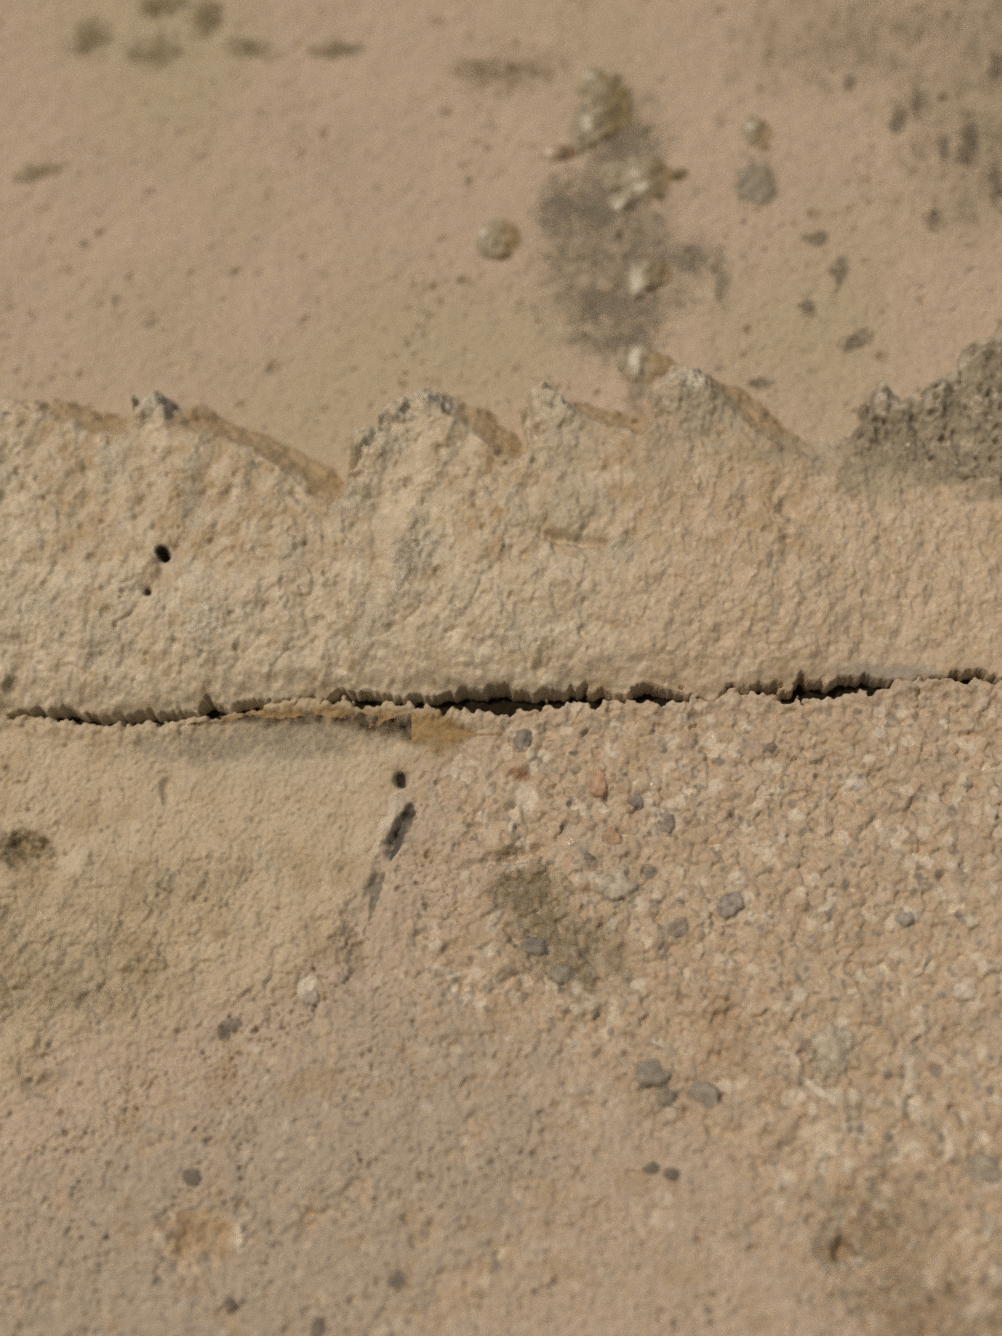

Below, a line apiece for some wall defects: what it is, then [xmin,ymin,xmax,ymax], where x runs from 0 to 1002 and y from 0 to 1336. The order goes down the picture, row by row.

water stain [548,180,706,352]
crack [57,707,260,726]
crack [349,694,681,717]
crack [756,684,890,704]